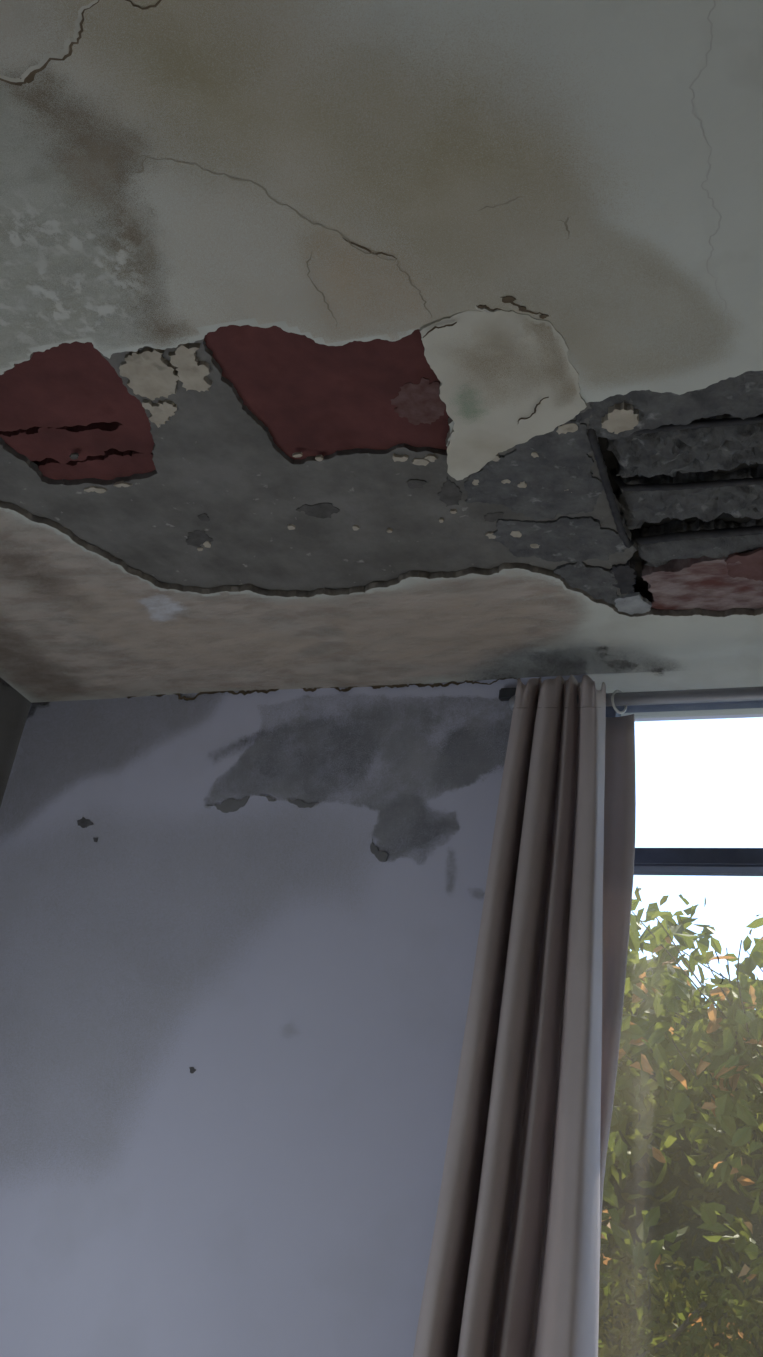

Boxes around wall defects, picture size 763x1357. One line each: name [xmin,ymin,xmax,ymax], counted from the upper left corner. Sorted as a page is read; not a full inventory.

crack [0,0,162,86]
water stain [0,0,195,346]
crack [134,156,432,327]
water stain [388,143,747,392]
spalling [0,325,763,617]
water stain [0,509,591,900]